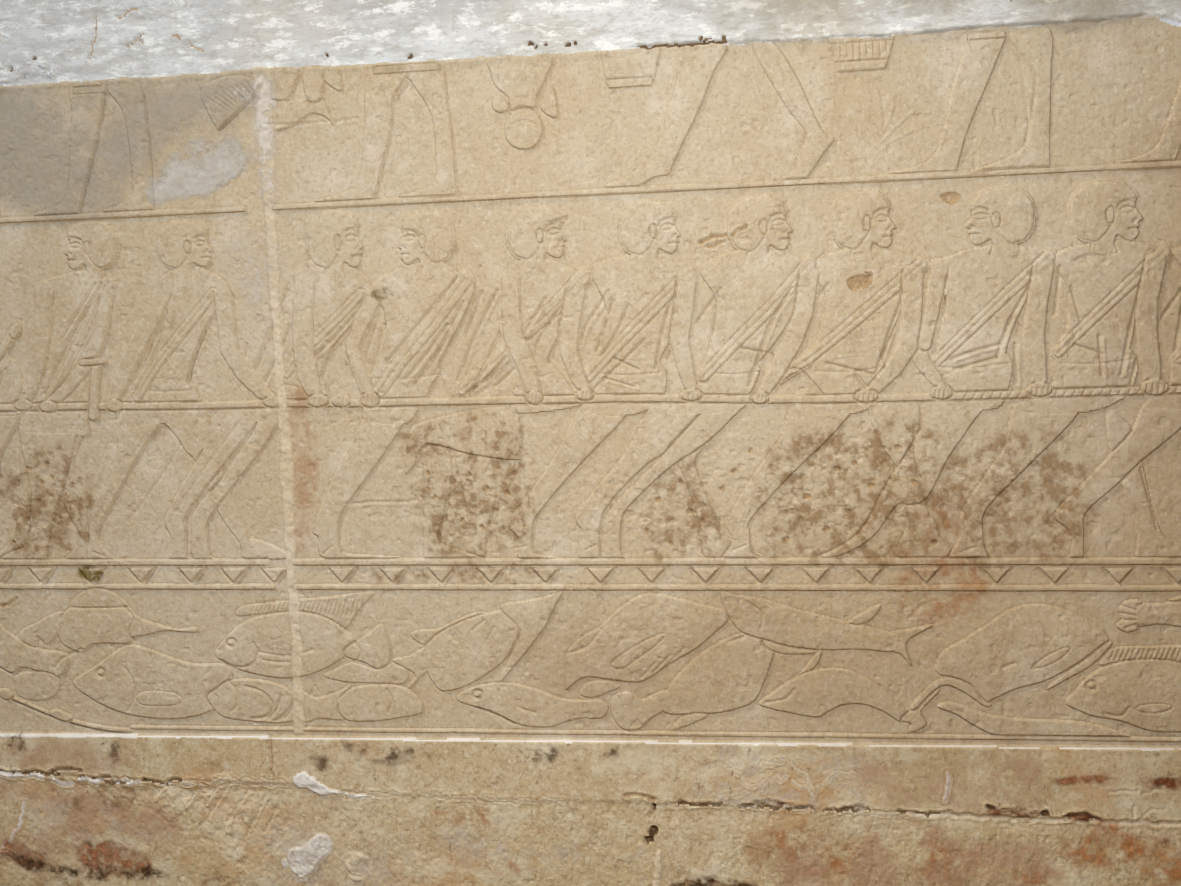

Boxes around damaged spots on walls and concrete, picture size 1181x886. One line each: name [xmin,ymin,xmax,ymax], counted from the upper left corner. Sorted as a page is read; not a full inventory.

crack [0,738,287,857]
crack [625,759,1181,846]